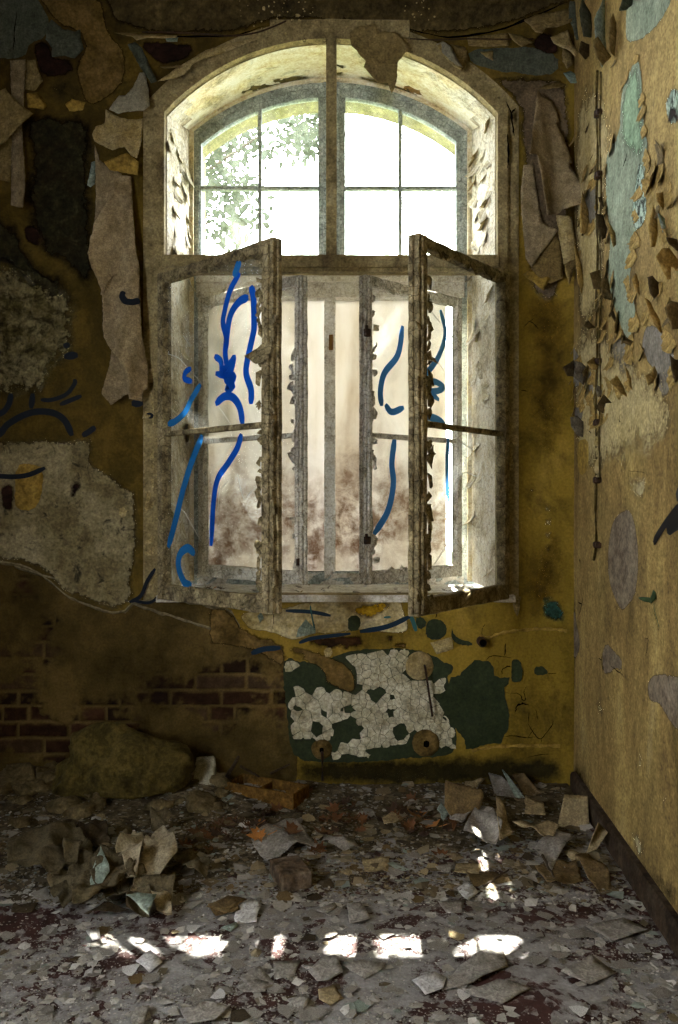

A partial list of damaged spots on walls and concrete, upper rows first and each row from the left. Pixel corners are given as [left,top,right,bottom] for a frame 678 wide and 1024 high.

flaking render [34,0,125,104]
peeling [626,0,670,42]
peeling [464,117,509,323]
peeling [563,54,678,475]
flaking render [0,239,548,781]
flaking render [608,510,638,610]
flaking render [648,674,678,729]
leakage [301,757,559,784]